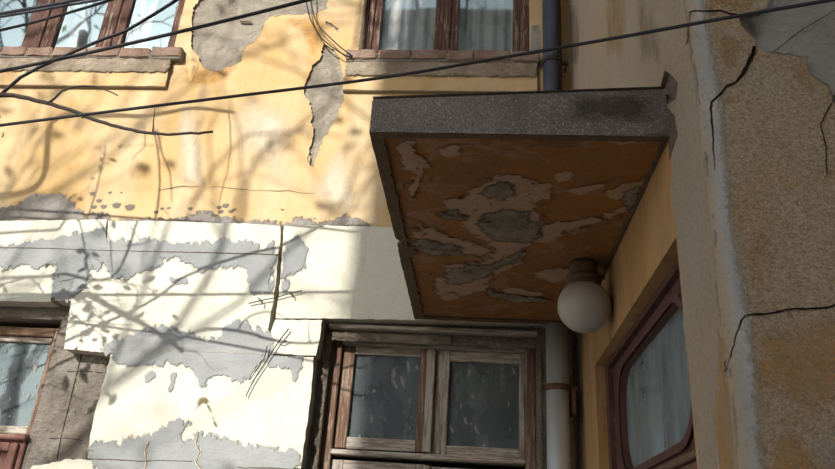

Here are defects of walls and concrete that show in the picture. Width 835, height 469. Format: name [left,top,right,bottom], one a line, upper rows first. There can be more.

spalling [0,57,171,73]
flaking render [191,0,328,72]
flaking render [304,25,541,167]
crack [686,9,736,44]
crack [709,10,835,175]
spalling [740,0,835,104]
flaking render [90,192,135,210]
peeling [396,140,434,203]
peeling [397,171,645,303]
crack [724,304,835,371]